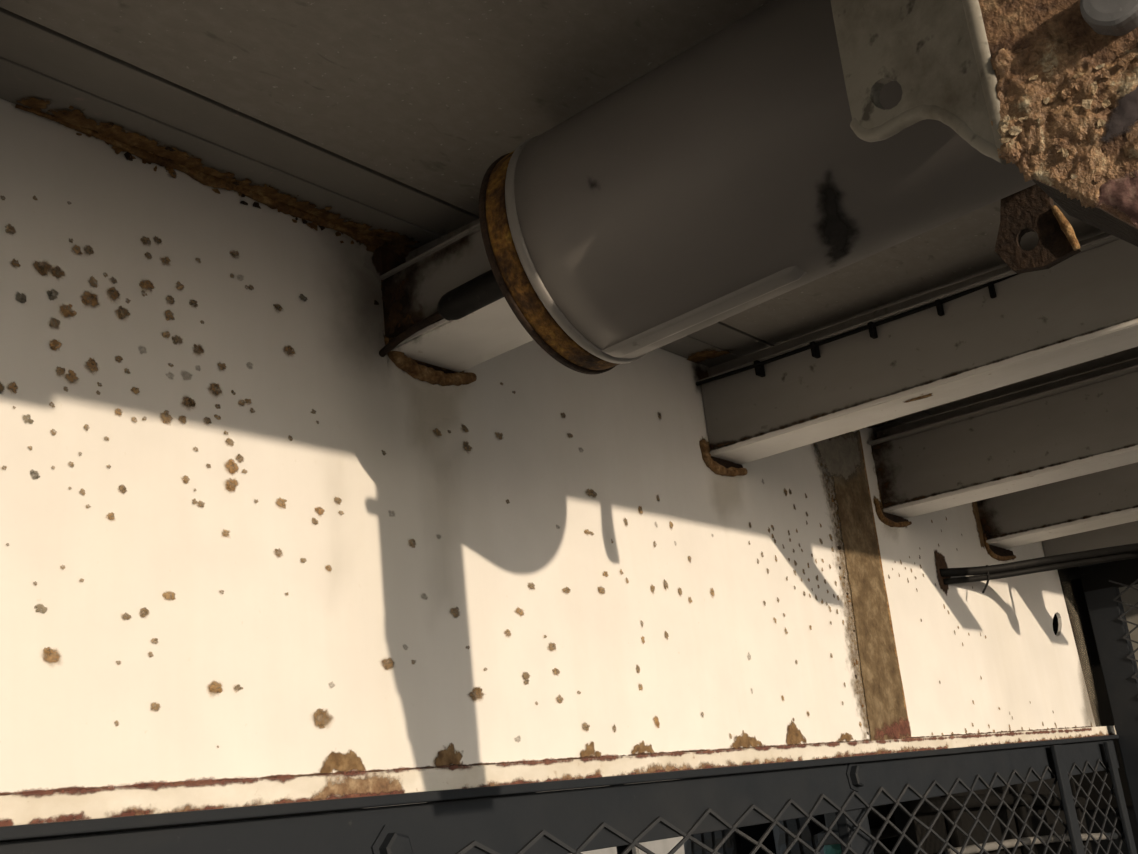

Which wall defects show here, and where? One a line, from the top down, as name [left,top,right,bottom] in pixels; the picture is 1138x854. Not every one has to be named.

rust [486,151,619,370]
damp [818,177,857,262]
rust [0,420,1138,807]
rust [30,811,89,824]
rust [112,804,224,818]